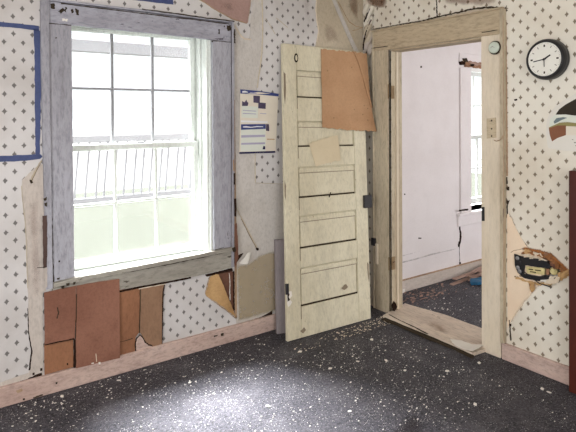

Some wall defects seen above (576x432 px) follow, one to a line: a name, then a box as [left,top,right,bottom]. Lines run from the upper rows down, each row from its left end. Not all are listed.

spalling [515,249,569,292]
spalling [135,334,152,351]